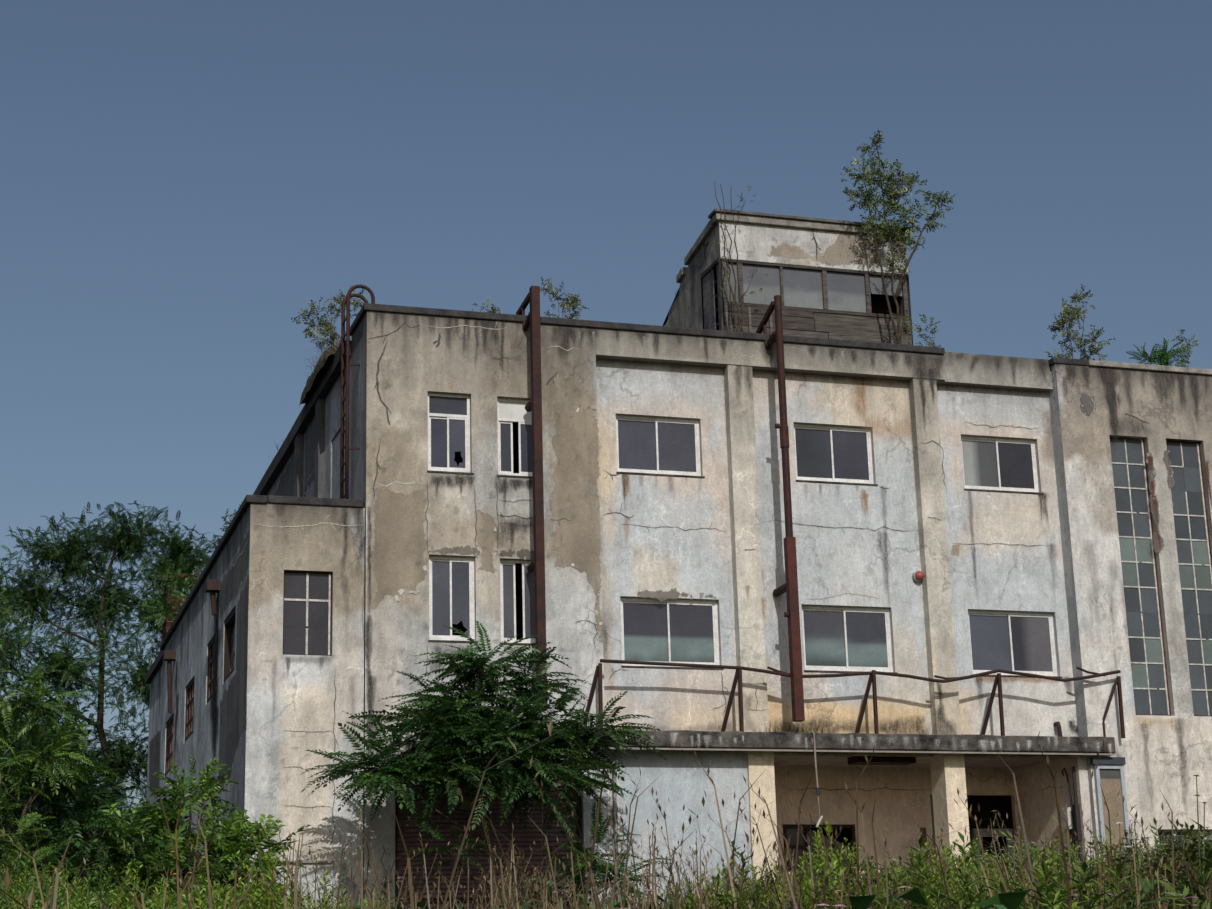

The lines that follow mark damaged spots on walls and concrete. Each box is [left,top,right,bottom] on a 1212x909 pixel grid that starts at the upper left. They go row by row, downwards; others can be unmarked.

peeling [767,232,881,267]
leakage [447,318,504,364]
crack [368,316,508,549]
leakage [1063,367,1130,436]
leakage [1154,371,1198,414]
crack [231,515,355,569]
peeling [371,487,534,609]
peeling [550,405,603,638]
leakage [203,590,221,758]
leakage [781,684,952,747]